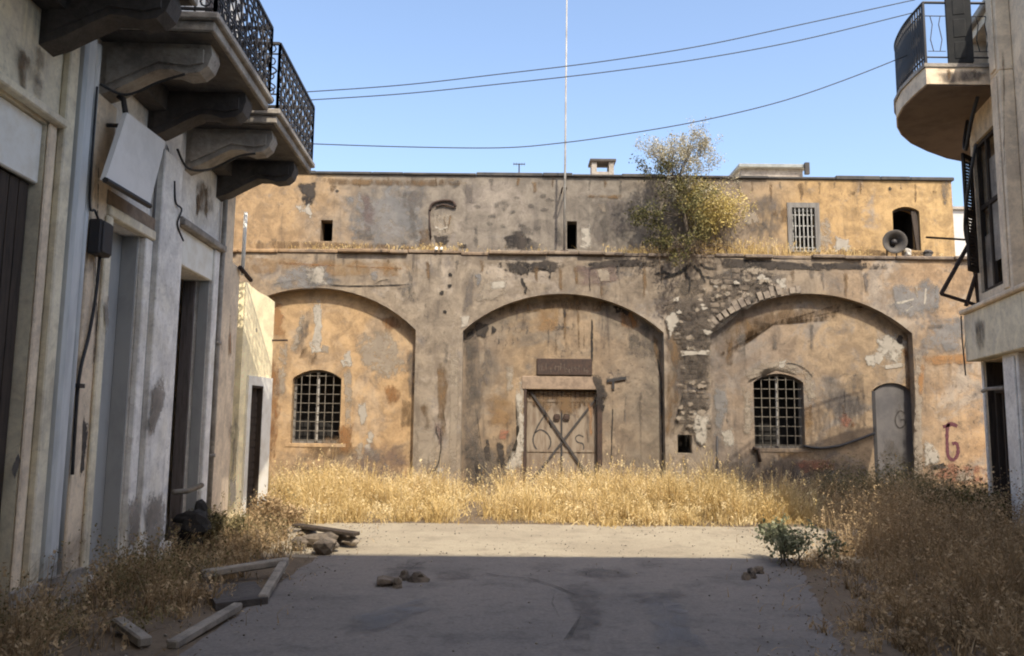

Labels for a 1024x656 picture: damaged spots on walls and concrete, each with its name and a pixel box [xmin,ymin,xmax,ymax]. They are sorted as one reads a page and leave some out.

spalling [296,182,316,218]
flaking render [666,266,816,446]
peeling [865,334,982,484]